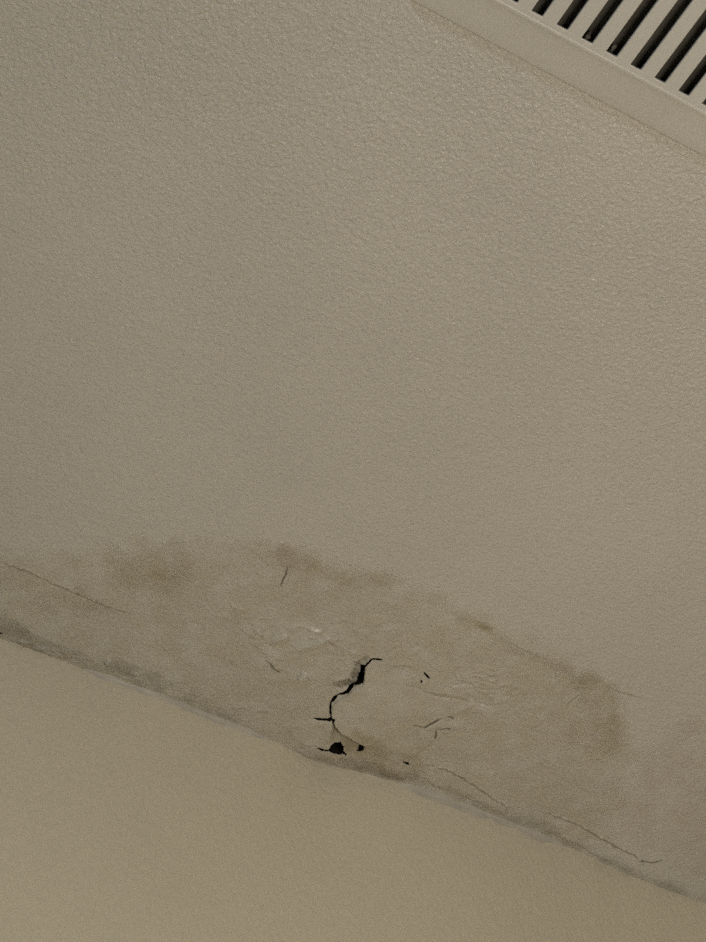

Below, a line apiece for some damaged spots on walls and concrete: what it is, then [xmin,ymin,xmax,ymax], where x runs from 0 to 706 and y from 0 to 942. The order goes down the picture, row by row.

flaking render [332,656,369,696]
crack [314,658,383,740]
spalling [331,726,359,751]